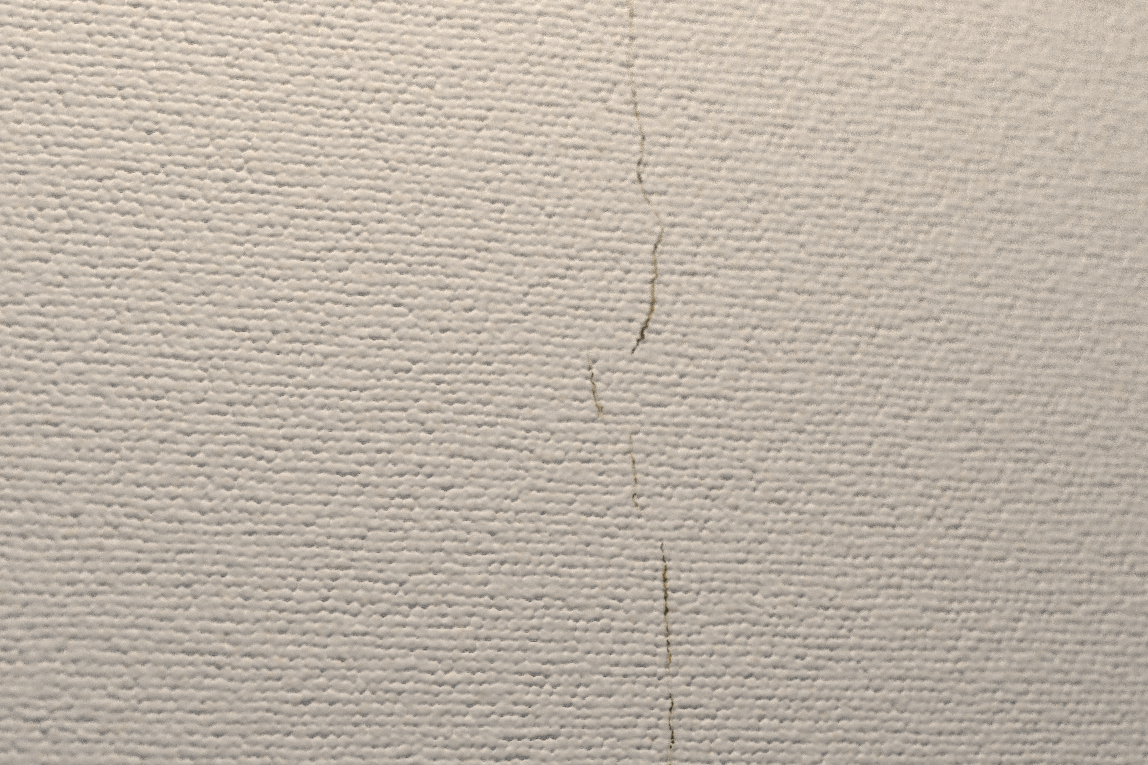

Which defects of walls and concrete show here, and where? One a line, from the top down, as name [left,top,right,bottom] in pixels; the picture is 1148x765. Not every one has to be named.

crack [627,0,664,354]
crack [589,361,603,415]
crack [630,435,640,510]
crack [661,542,675,765]